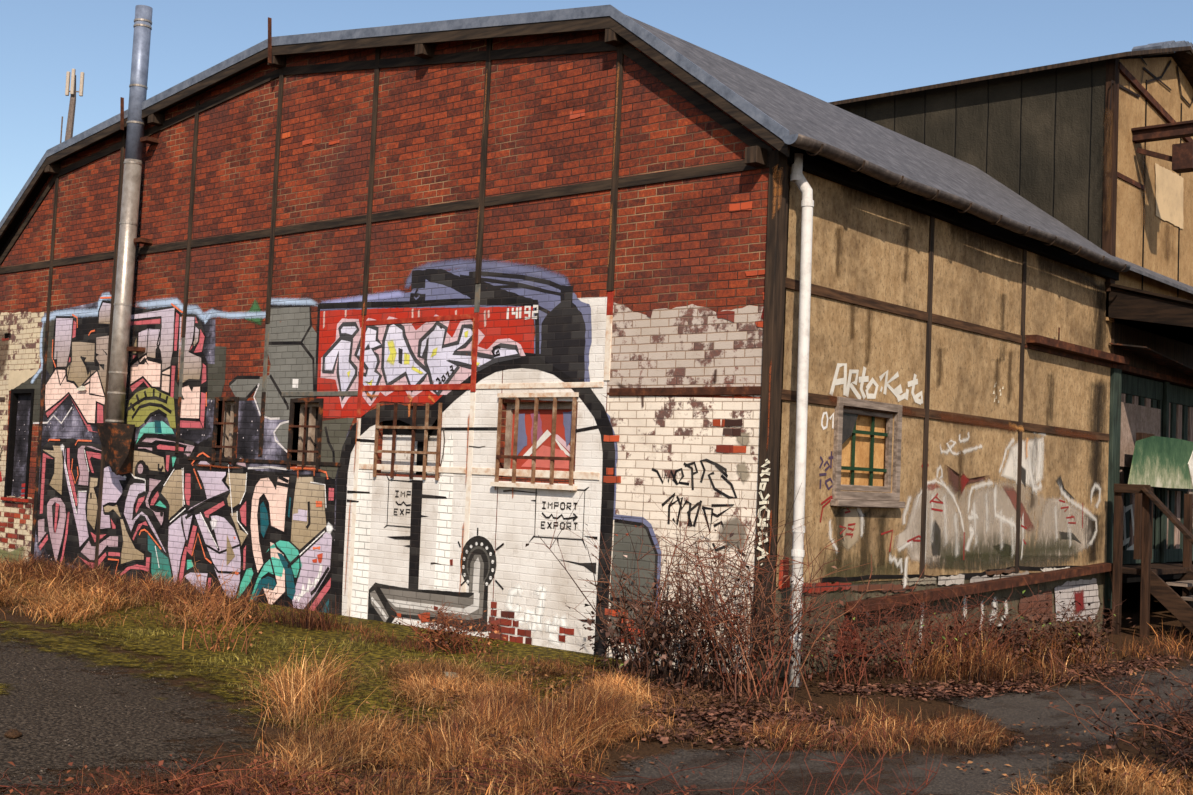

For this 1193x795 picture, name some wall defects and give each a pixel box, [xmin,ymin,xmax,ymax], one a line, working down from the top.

peeling [716,310,735,322]
spalling [713,419,746,453]
peeling [603,467,621,483]
peeling [0,497,34,549]
peeling [486,602,532,645]
peeling [559,626,574,642]
peeling [605,608,644,644]